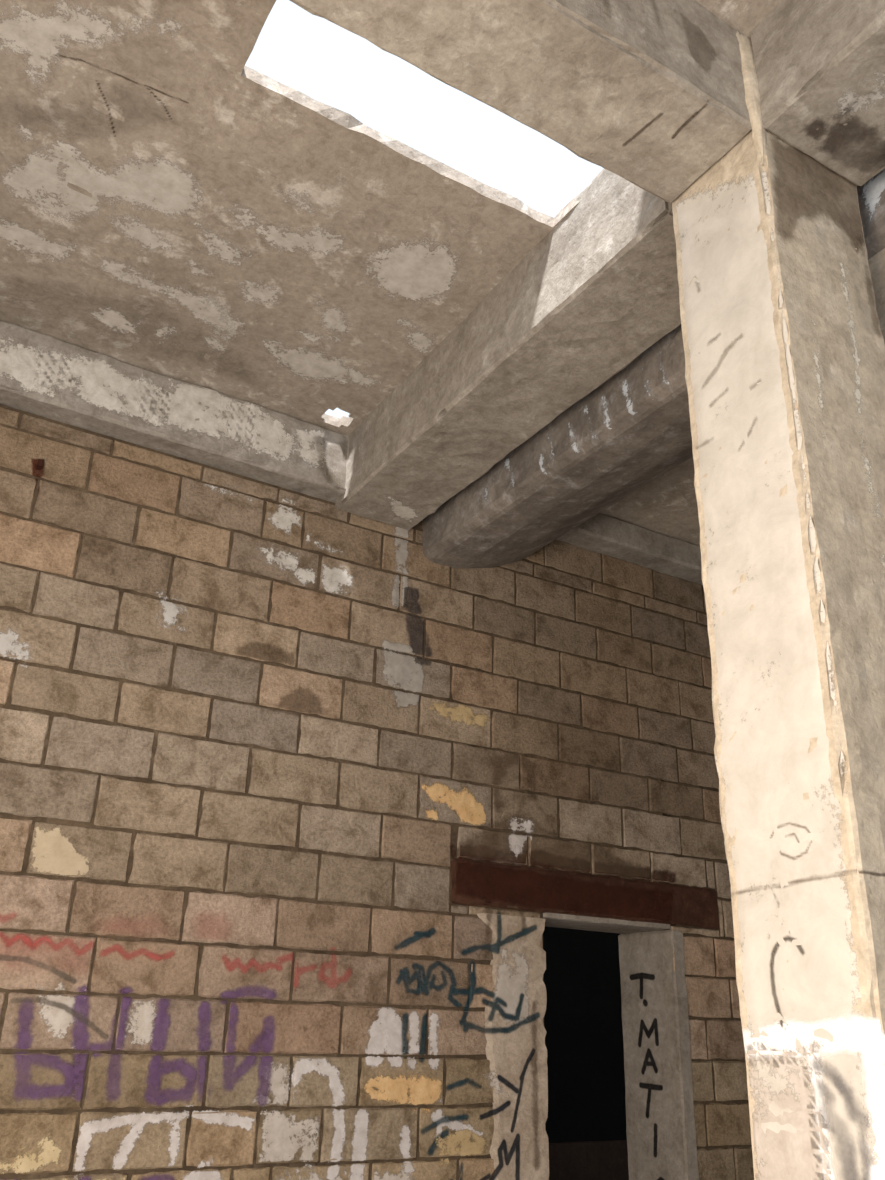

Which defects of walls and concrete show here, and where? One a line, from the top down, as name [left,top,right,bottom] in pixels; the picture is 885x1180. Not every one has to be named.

peeling [0,125,283,355]
peeling [219,204,346,259]
leakage [775,71,885,203]
leakage [840,148,885,250]
leakage [382,497,432,707]
rust [451,846,676,922]